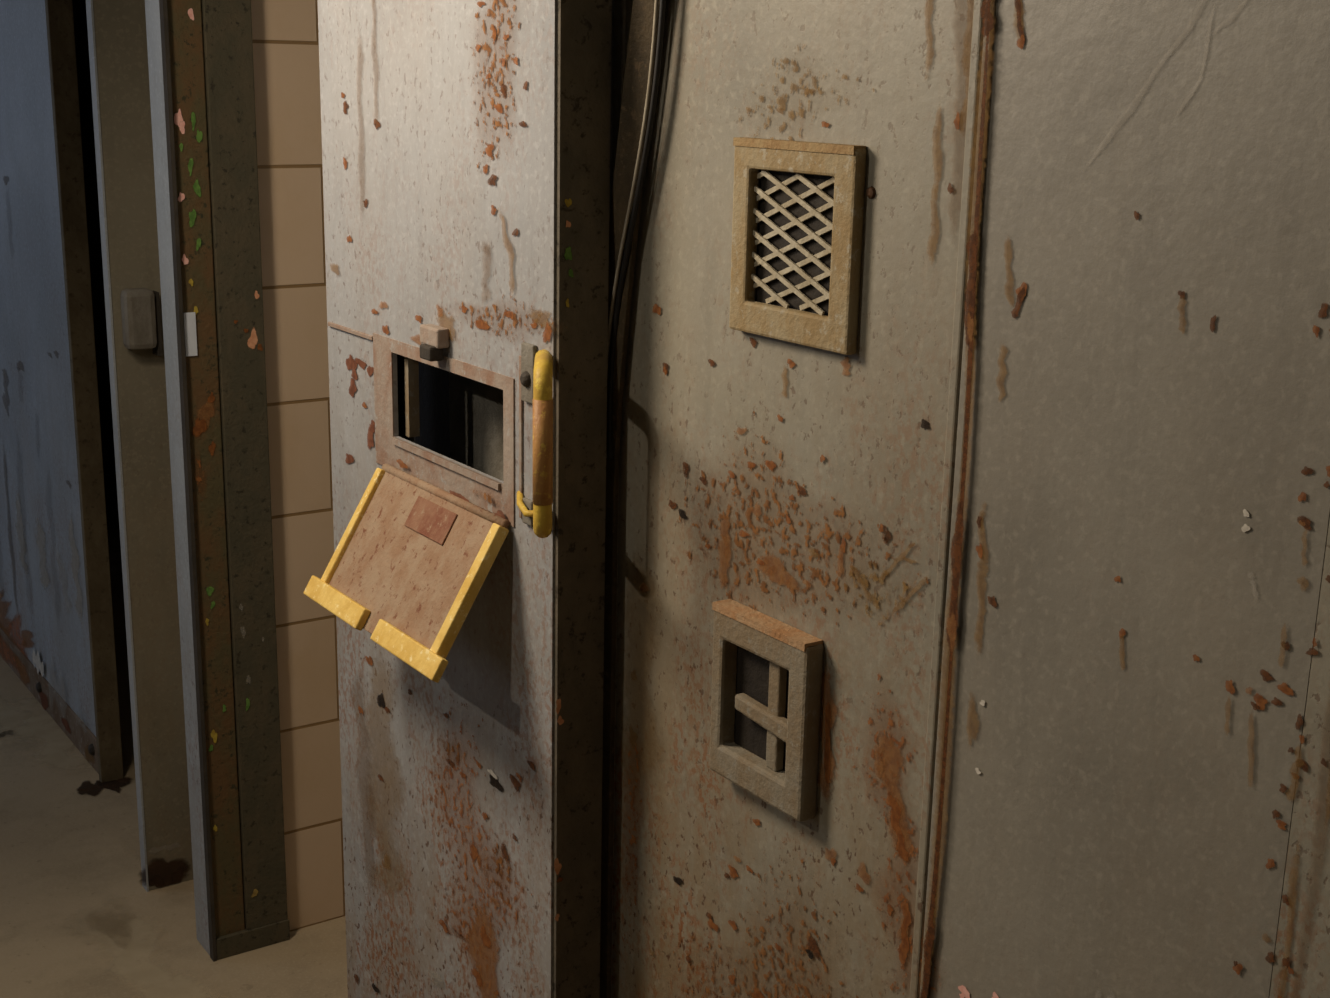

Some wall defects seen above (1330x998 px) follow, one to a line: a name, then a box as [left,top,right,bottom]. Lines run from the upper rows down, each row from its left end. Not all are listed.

rust [1014,0,1025,49]
rust [470,0,528,186]
rust [739,45,859,141]
rust [371,302,389,334]
rust [437,295,554,342]
rust [668,411,929,625]
rust [853,0,994,998]
rust [358,693,390,714]
rust [817,672,836,798]
rust [1225,669,1293,710]
rust [430,696,536,998]
rust [670,842,858,998]